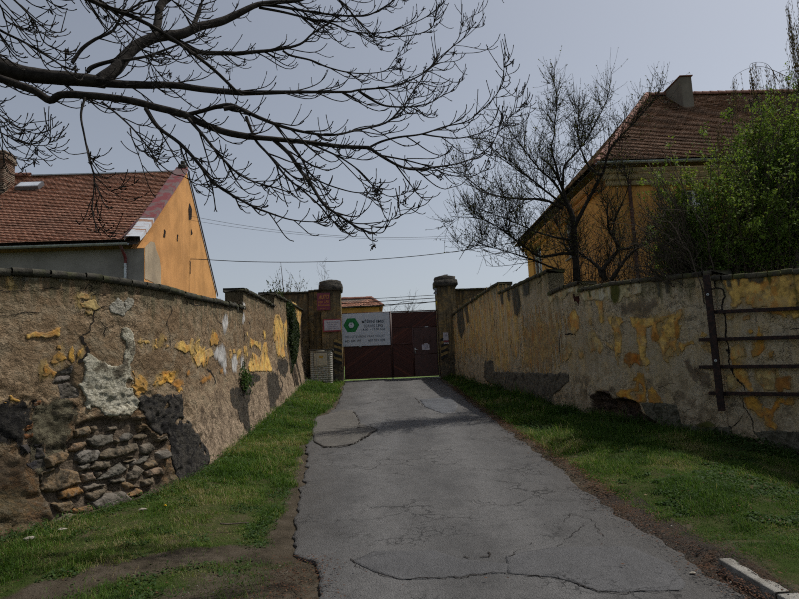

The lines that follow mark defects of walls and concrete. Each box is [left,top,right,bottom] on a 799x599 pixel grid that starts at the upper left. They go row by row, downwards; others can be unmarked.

flaking render [26,327,83,399]
crack [78,284,111,363]
peeling [131,371,183,396]
peeling [229,302,302,373]
peeling [548,283,711,426]
crack [712,281,753,433]
peeling [726,326,795,430]
peeling [723,272,799,319]
flaking render [20,415,172,520]
crack [350,542,542,579]